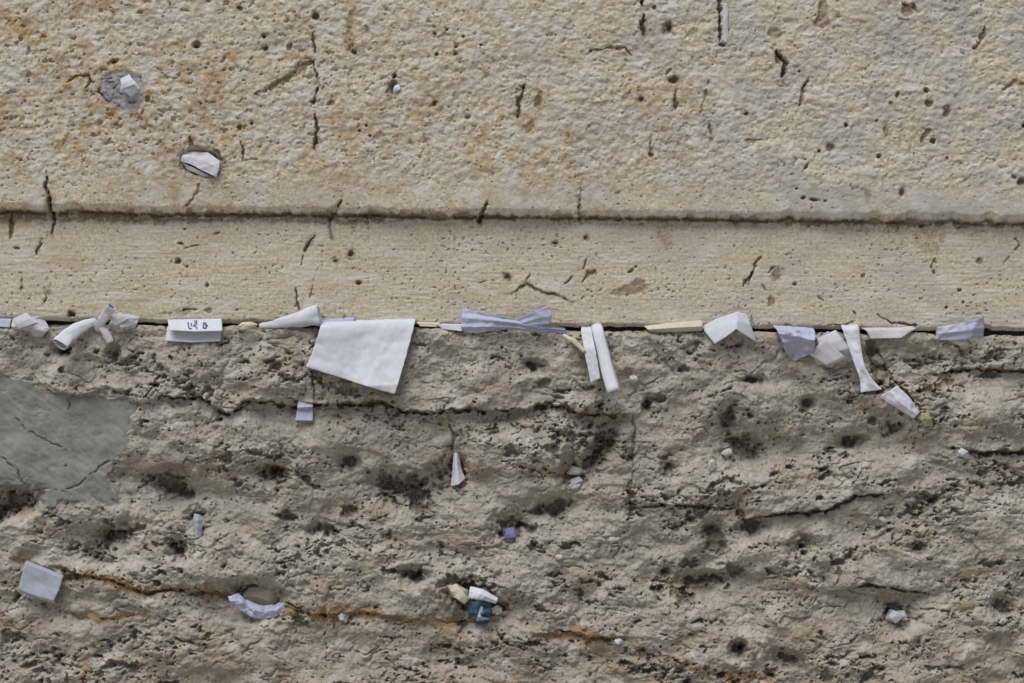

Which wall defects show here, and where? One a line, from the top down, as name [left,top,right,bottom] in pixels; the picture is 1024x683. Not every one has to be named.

crack [143,371,881,522]
crack [7,461,109,492]
crack [913,485,955,519]
corrosion [60,568,231,624]
corrosion [280,600,473,652]